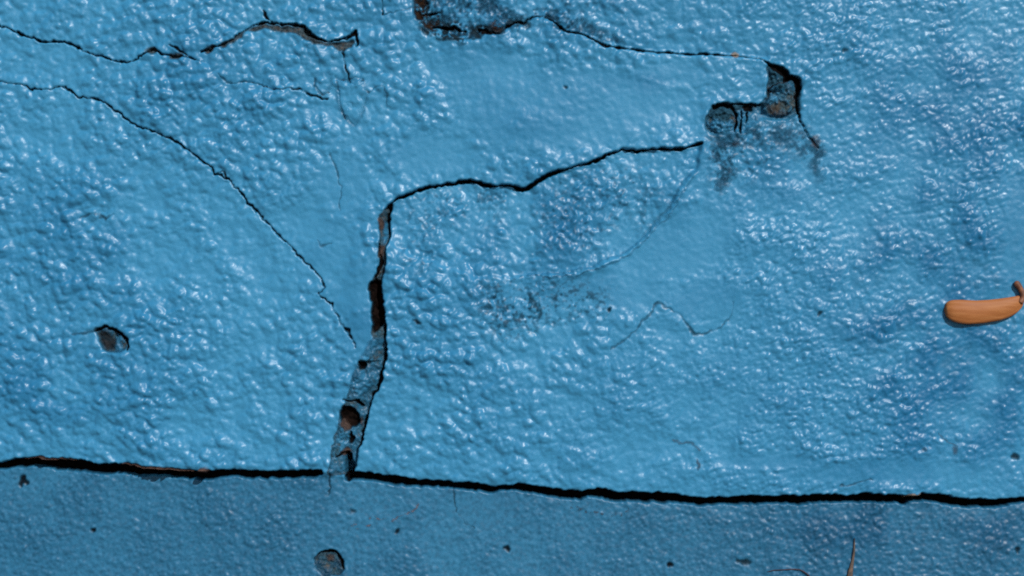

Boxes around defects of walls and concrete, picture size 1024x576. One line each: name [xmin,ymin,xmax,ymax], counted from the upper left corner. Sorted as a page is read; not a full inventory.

crack [0,10,359,82]
spalling [414,0,562,41]
crack [551,14,770,66]
spalling [705,64,801,137]
crack [387,142,703,208]
crack [0,81,356,348]
spalling [95,325,129,352]
spalling [327,206,392,476]
crack [0,454,1024,506]
spalling [314,549,344,576]